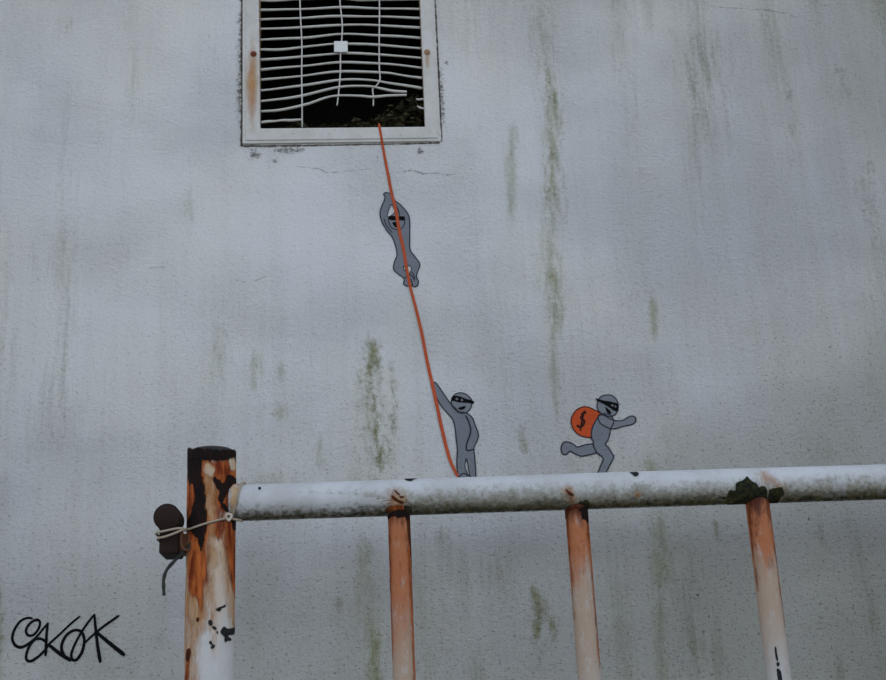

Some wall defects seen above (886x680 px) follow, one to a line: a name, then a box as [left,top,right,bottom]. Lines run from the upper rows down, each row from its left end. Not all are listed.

corrosion [248,63,256,105]
corrosion [184,458,239,680]